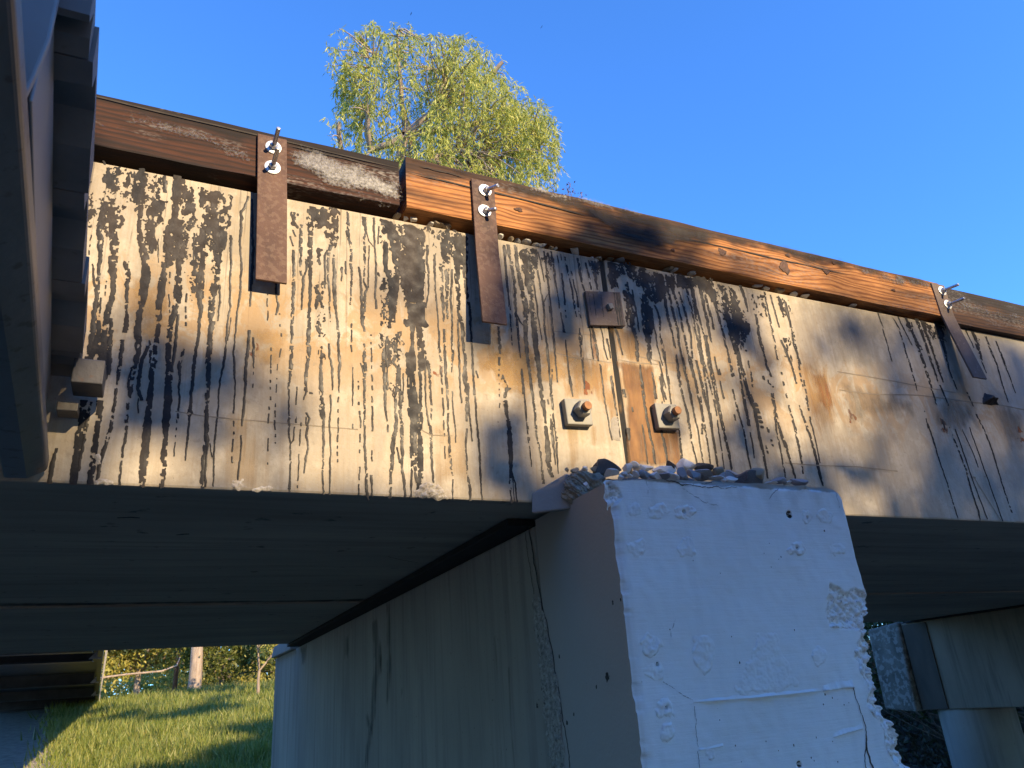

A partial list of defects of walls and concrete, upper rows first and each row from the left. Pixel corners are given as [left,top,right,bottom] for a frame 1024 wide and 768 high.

corrosion [806,372,832,415]
spalling [231,478,273,492]
spalling [414,482,448,501]
spalling [561,470,623,510]
crack [525,529,570,768]
spalling [826,585,909,768]